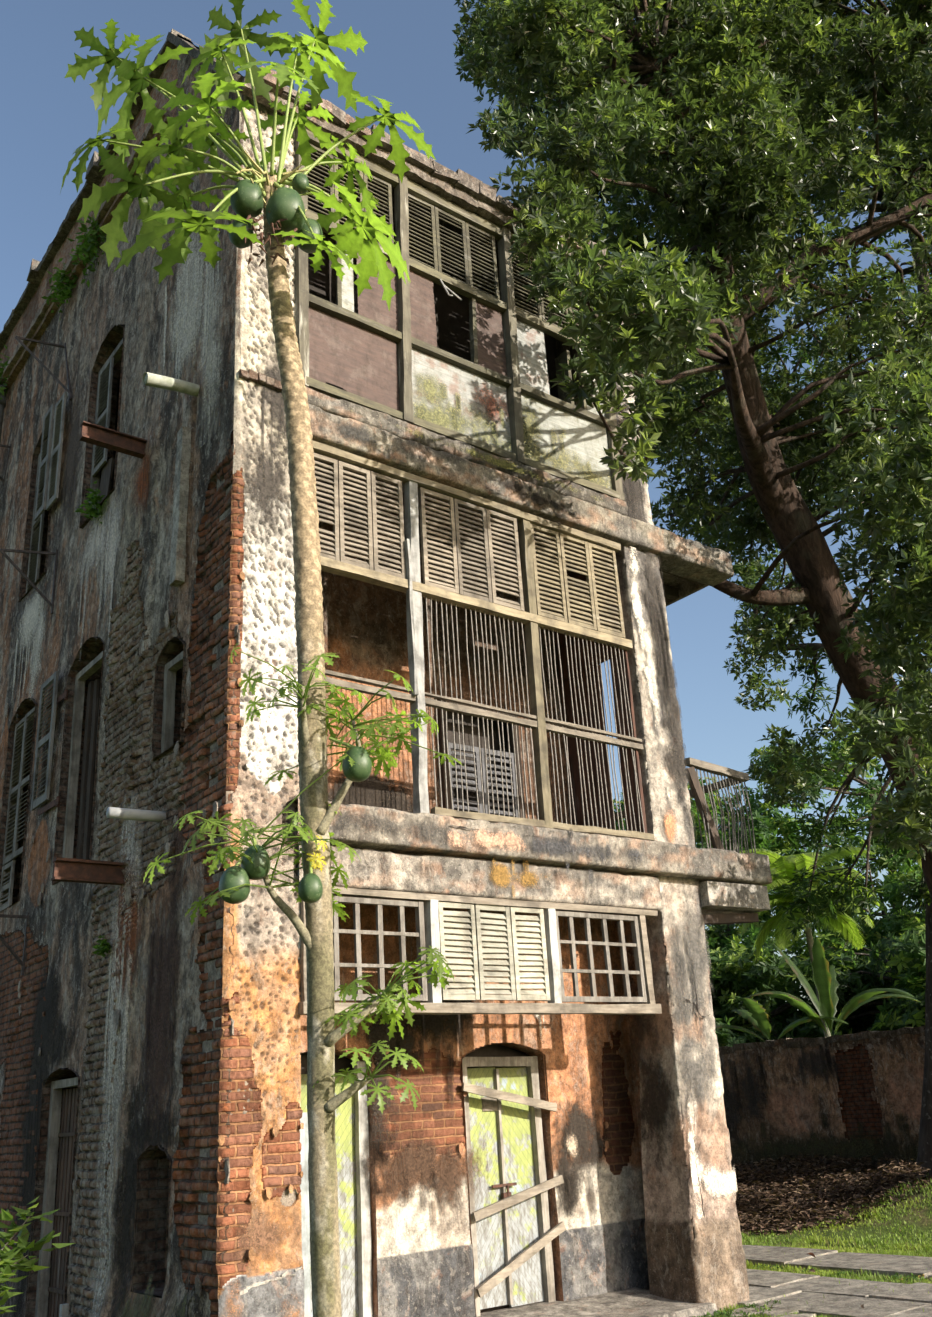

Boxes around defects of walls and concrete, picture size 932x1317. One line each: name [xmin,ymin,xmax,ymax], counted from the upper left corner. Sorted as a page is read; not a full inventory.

leakage [441,384,461,427]
leakage [500,478,576,529]
flaking render [0,703,10,818]
spalling [67,427,304,1317]
spalling [0,925,49,1264]
leakage [104,820,136,1194]
leakage [145,809,184,1149]
spalling [371,1048,502,1158]
spalling [601,1030,636,1175]
leakage [797,1042,839,1084]
spalling [835,1044,924,1144]
leakage [563,1126,595,1213]